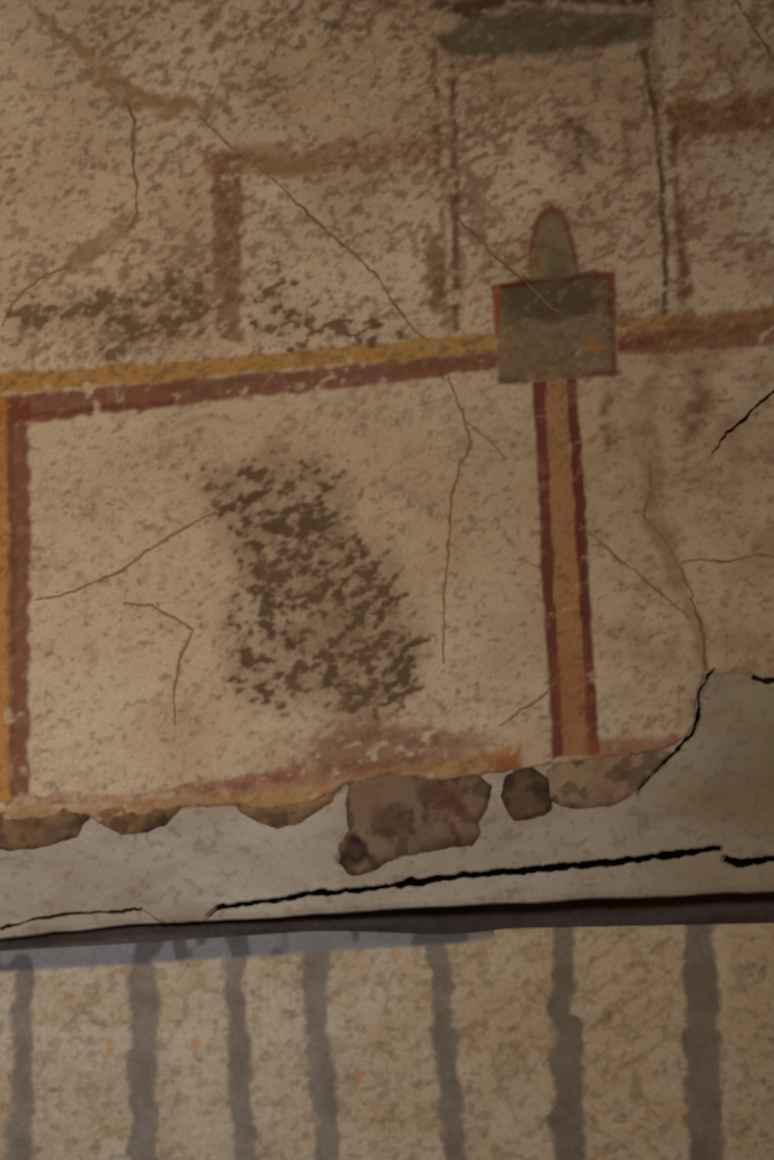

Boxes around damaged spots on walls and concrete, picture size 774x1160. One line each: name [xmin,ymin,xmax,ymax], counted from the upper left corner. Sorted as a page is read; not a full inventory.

crack [711,390,774,455]
damp [205,460,430,718]
spalling [0,807,181,851]
spalling [236,750,672,876]
crack [0,845,774,931]